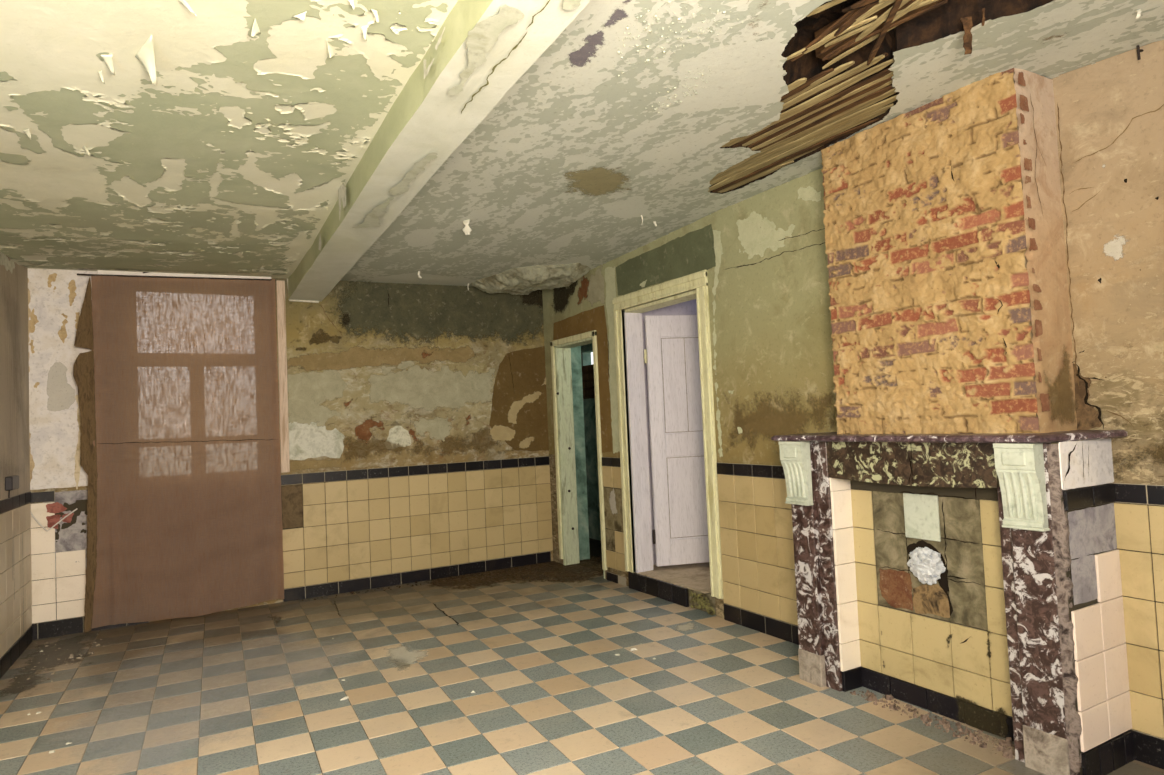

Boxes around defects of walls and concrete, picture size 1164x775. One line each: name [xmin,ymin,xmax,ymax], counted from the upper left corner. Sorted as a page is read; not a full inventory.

crack [461,0,550,114]
peeling [854,0,1164,134]
peeling [0,0,448,353]
peeling [340,0,831,457]
damp [564,167,629,196]
crack [1030,93,1164,481]
peeling [43,395,88,578]
peeling [282,485,303,528]
flaking render [287,345,495,471]
peeling [872,491,988,630]
flaking render [1073,364,1103,430]
damp [1113,445,1164,478]